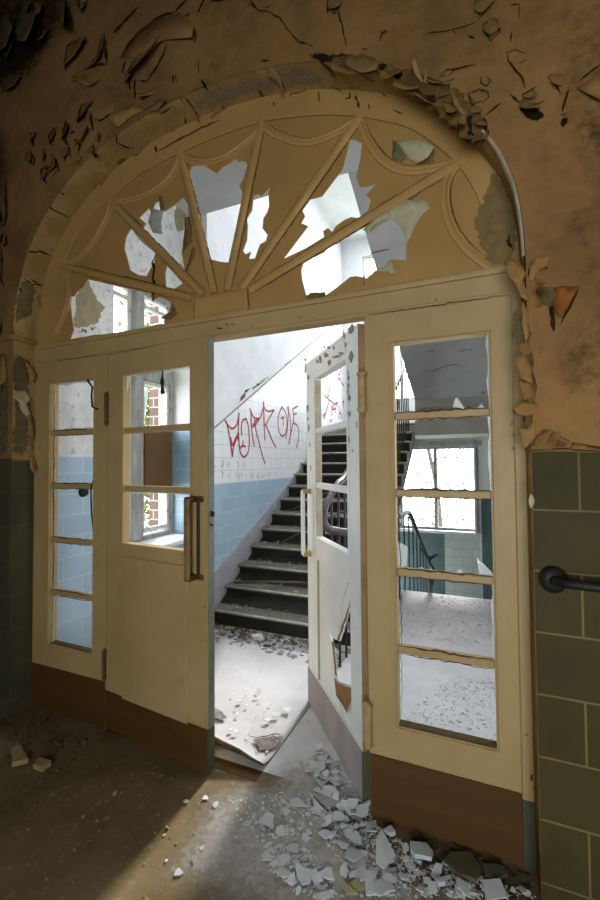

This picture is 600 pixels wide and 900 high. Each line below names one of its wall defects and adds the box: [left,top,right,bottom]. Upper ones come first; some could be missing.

peeling [0,0,138,86]
crack [245,0,314,47]
peeling [25,0,204,184]
peeling [310,52,489,145]
peeling [510,90,545,121]
peeling [547,65,600,127]
peeling [74,281,105,333]
peeling [475,173,600,453]
flaking render [0,354,38,473]
peeling [304,324,357,428]